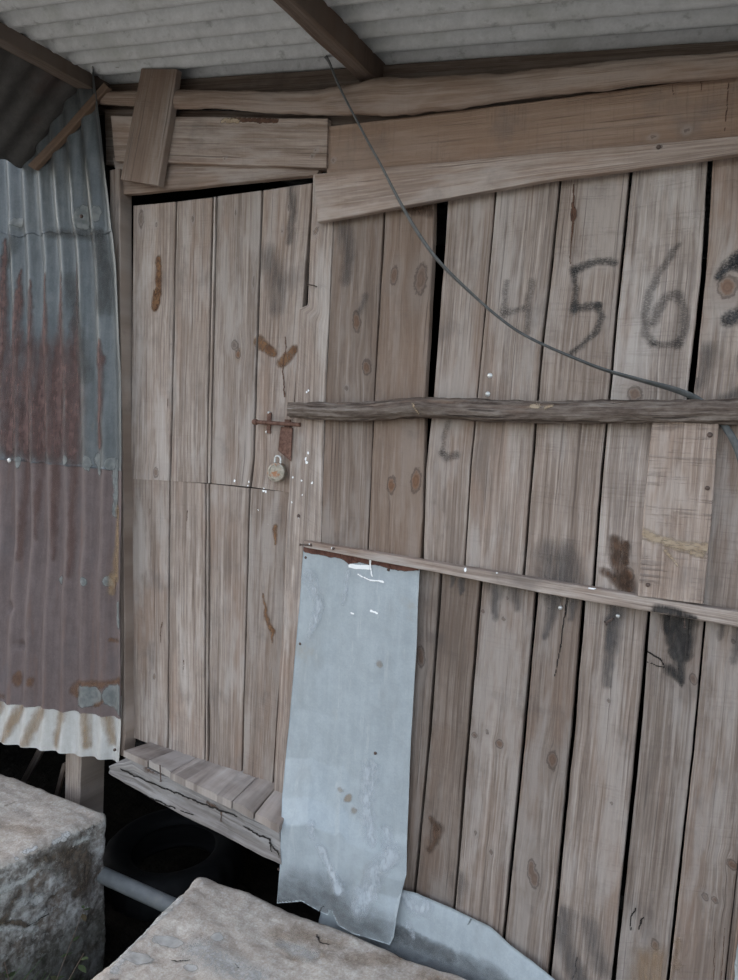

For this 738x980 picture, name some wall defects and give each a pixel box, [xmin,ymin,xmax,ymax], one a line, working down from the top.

rust [0,239,80,458]
leakage [601,536,634,592]
leakage [653,605,697,686]
rust [2,705,23,742]
rust [83,701,103,748]
crack [120,768,279,855]